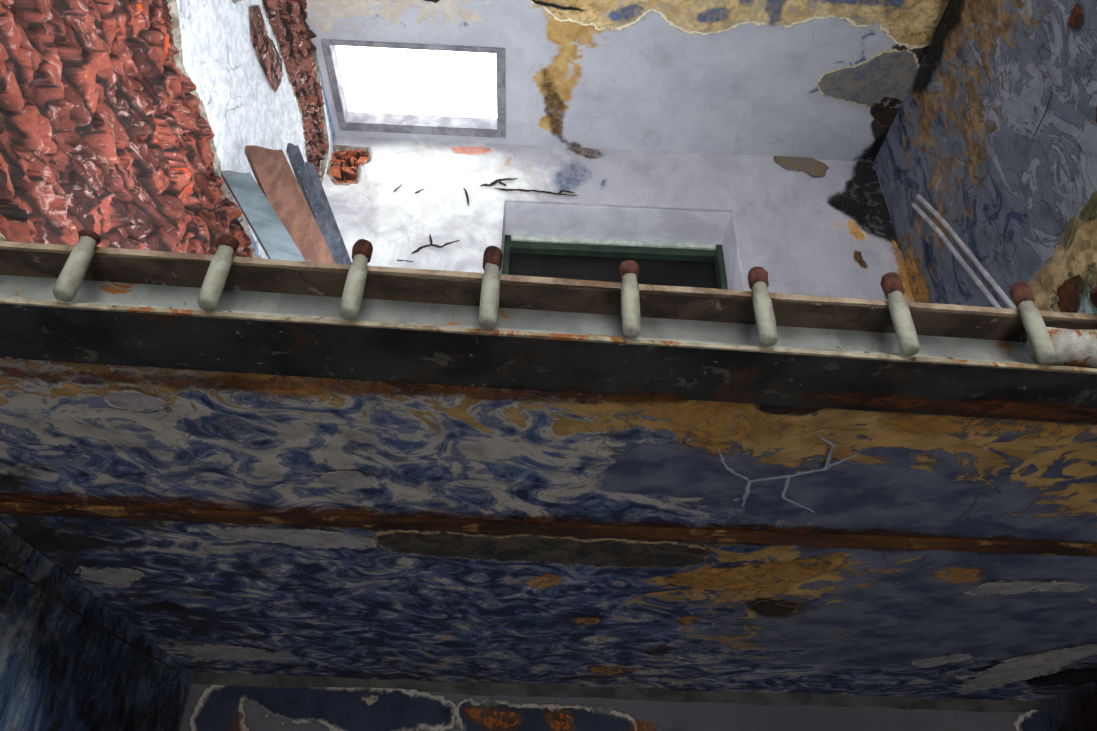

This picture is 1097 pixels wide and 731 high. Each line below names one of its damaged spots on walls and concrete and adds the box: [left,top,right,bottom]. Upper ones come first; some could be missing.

flaking render [0,0,262,258]
spalling [451,146,493,155]
crack [463,178,578,206]
crack [397,234,460,262]
corrosion [904,257,929,303]
leakage [207,371,376,397]
spalling [753,404,823,417]
crack [719,434,860,513]
corrosion [0,493,1094,555]
peeling [965,579,1097,603]
leakage [0,527,638,731]
peeling [957,644,1097,695]